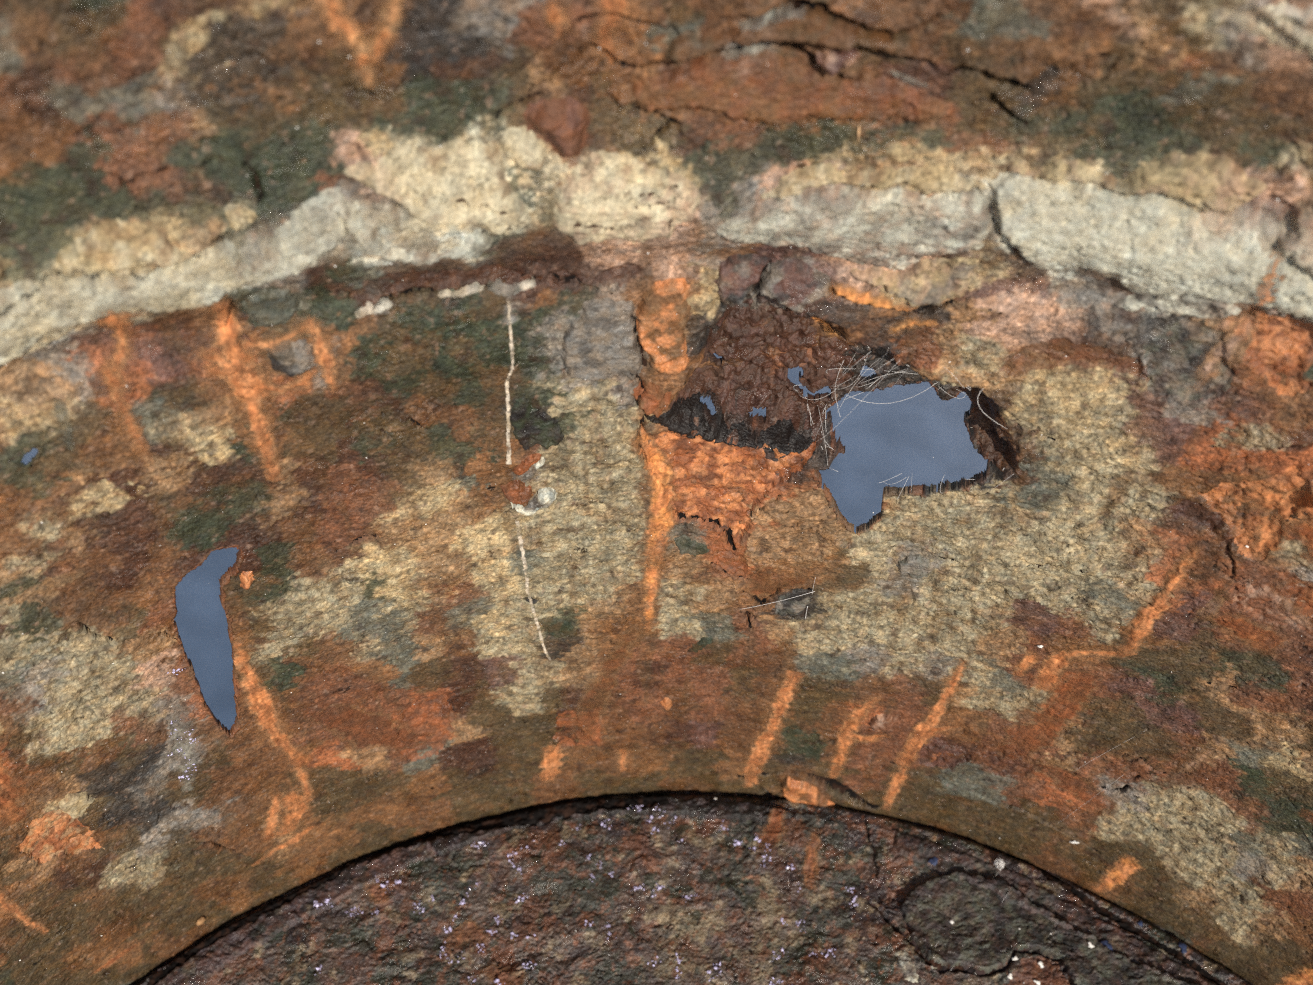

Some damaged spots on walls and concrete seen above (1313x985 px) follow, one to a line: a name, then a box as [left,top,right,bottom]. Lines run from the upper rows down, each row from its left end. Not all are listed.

crack [496,15,676,151]
crack [783,0,940,59]
crack [921,59,1030,125]
peeling [0,125,648,367]
peeling [553,150,701,245]
peeling [716,142,1313,401]
rust [202,288,337,480]
rust [636,428,677,548]
spalling [640,298,870,579]
rust [233,645,313,860]
rust [883,661,966,806]
crack [805,773,1077,985]